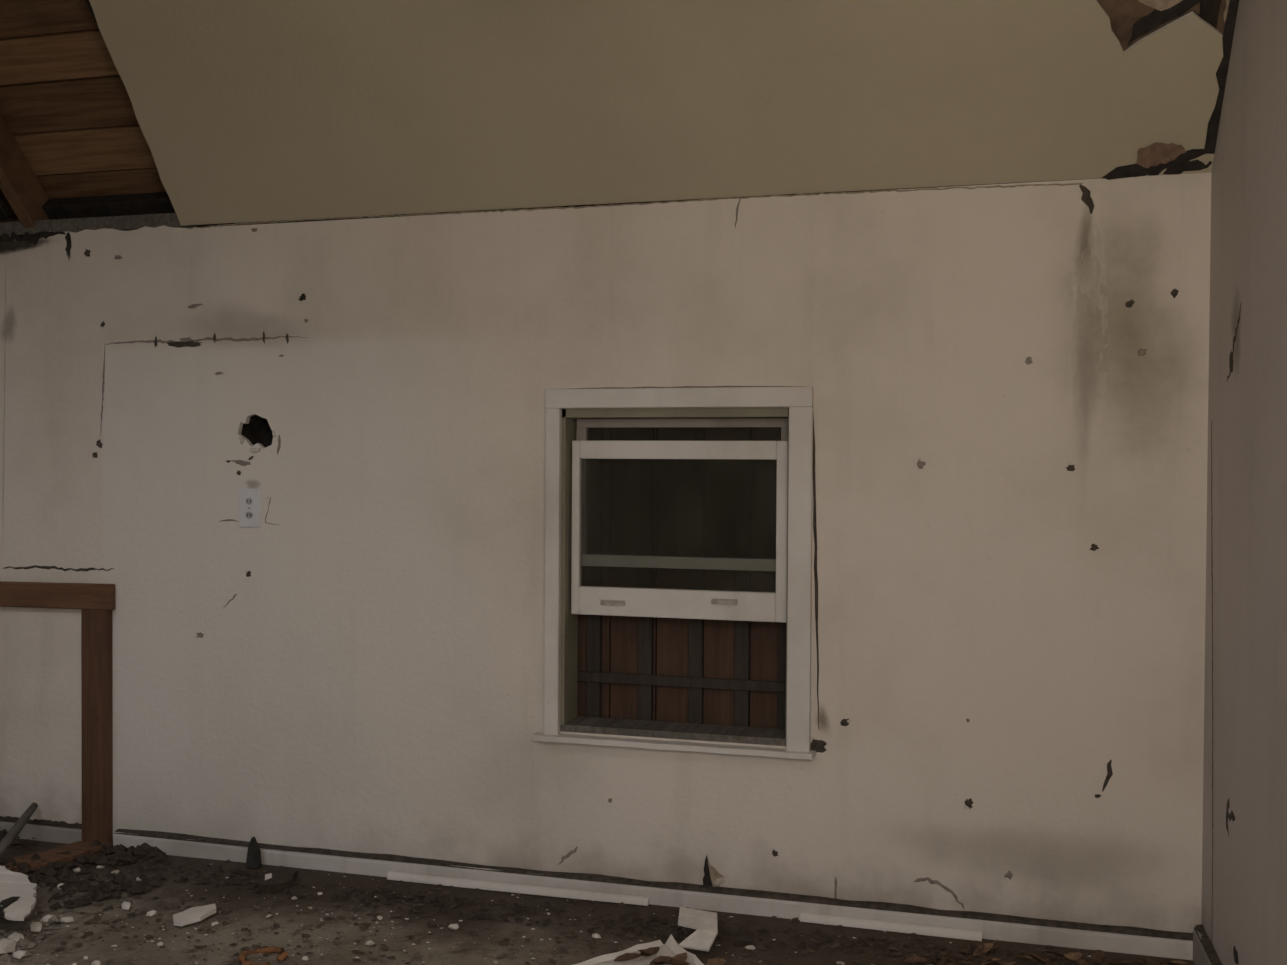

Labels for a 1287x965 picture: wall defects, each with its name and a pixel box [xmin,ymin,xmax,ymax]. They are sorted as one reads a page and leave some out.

spalling [226,415,276,476]